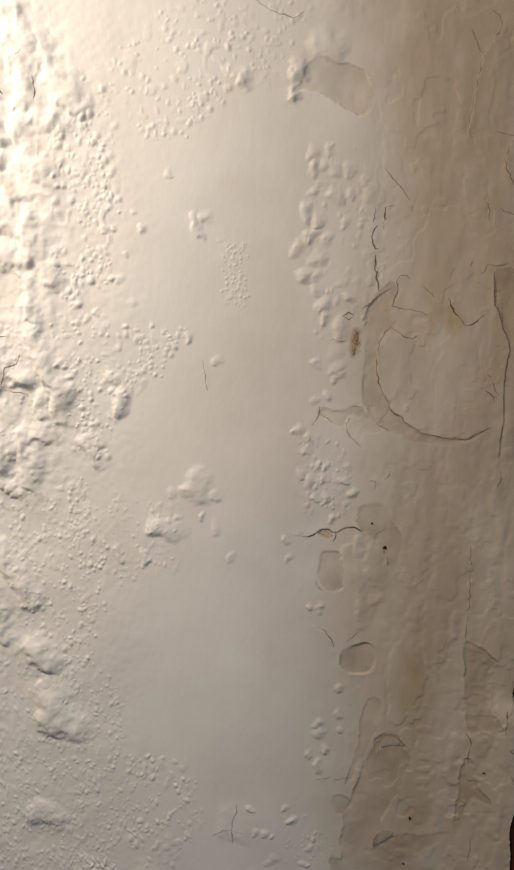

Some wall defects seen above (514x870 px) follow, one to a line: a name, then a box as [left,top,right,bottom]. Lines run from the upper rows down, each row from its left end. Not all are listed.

peeling [291,56,374,116]
peeling [494,267,514,344]
peeling [318,281,485,445]
peeling [356,503,403,571]
peeling [339,642,376,675]